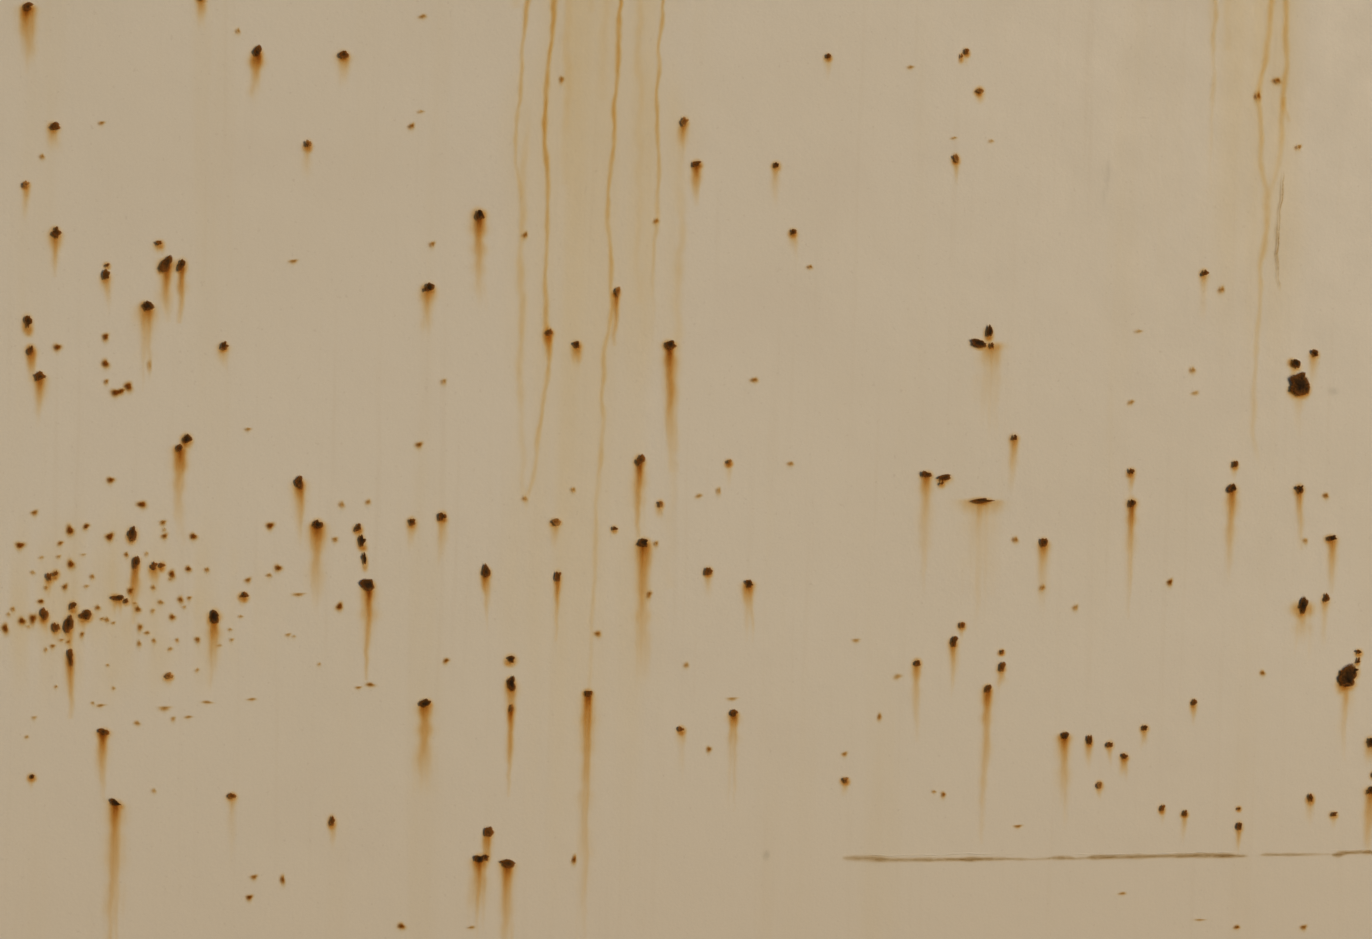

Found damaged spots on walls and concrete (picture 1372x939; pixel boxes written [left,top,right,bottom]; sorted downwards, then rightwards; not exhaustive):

rust [972,325,994,348]
rust [1290,349,1318,396]
rust [922,471,950,485]
rust [107,526,208,602]
rust [3,561,155,666]
rust [1339,650,1362,687]
rust [474,854,515,868]